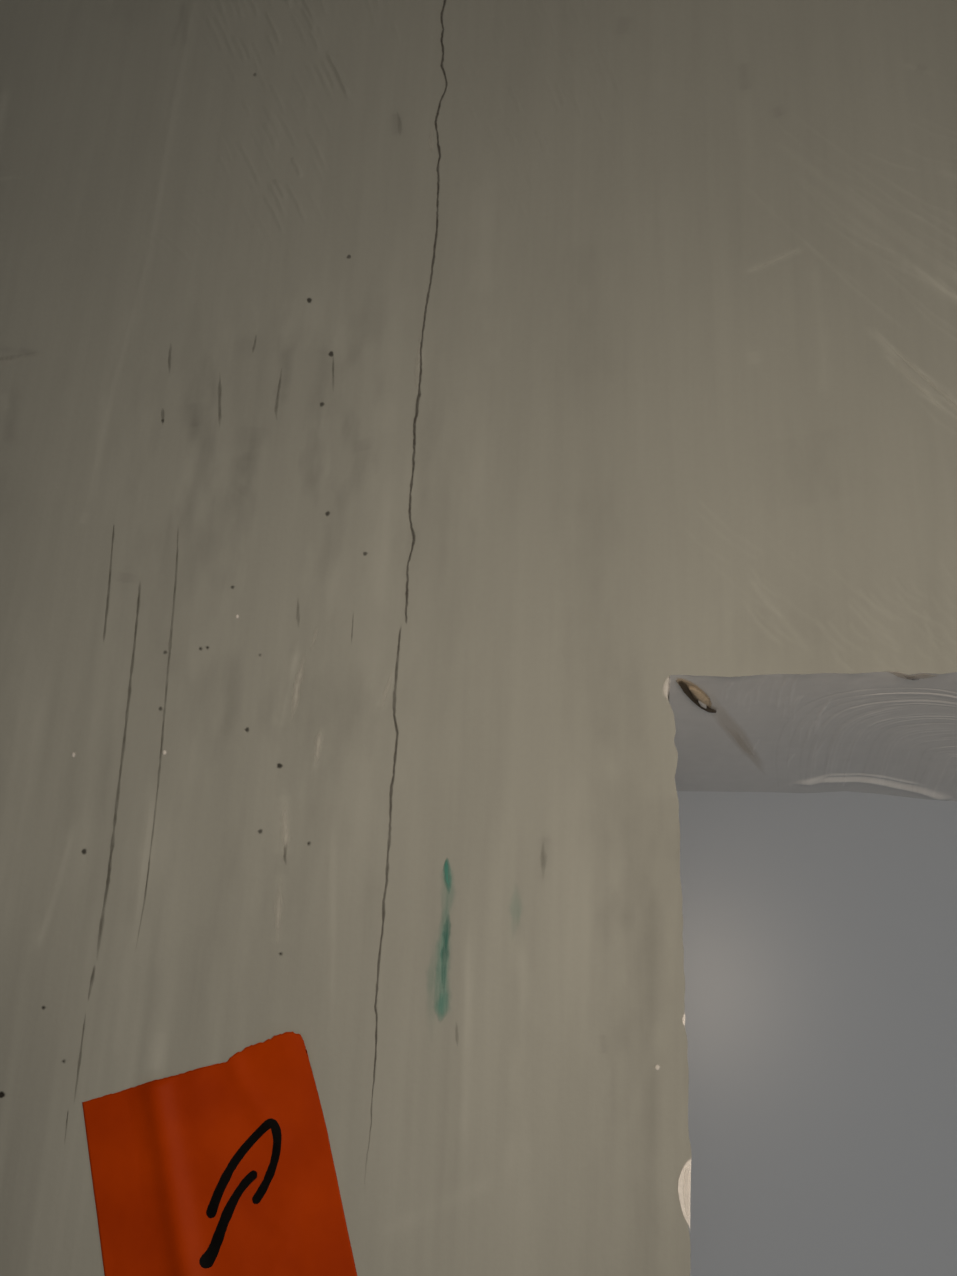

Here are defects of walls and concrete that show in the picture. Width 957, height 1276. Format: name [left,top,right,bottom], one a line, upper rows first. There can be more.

crack [395,0,447,678]
crack [372,710,398,1094]